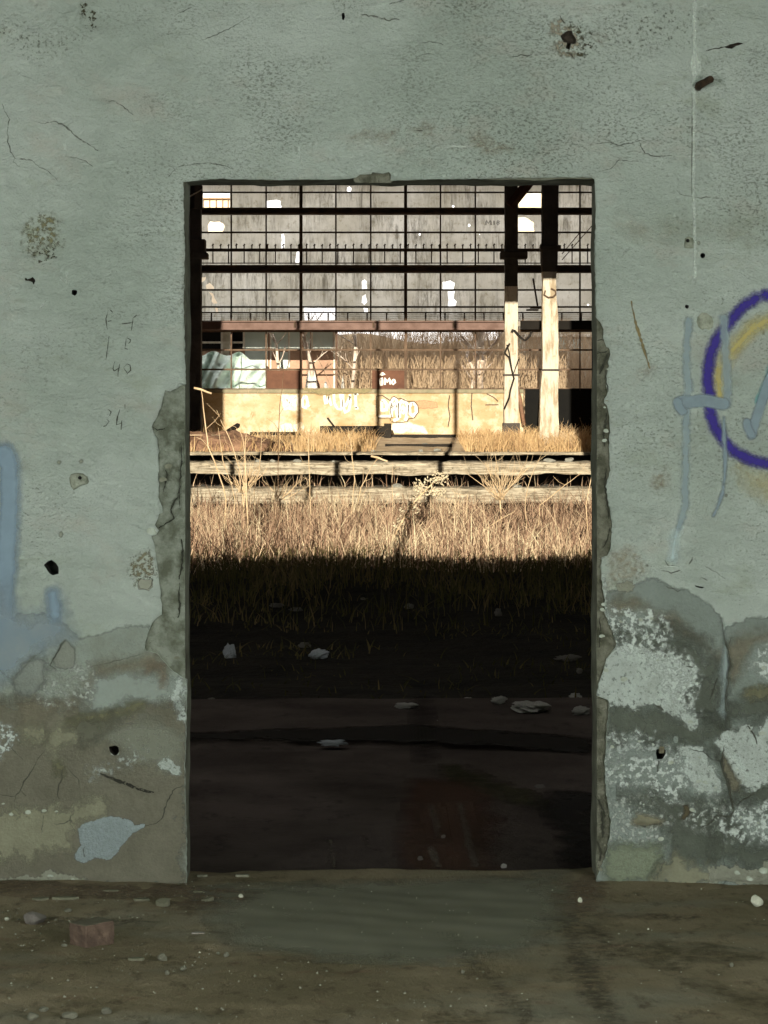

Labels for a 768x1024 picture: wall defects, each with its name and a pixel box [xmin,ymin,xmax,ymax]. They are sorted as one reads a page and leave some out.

crack [2,104,51,174]
crack [38,121,98,166]
crack [593,140,672,171]
spalling [44,560,59,575]
flaking render [138,385,187,723]
peeling [595,319,768,875]
crack [0,731,80,832]
damp [0,613,592,884]
crack [686,619,762,827]
flaking render [707,861,768,885]